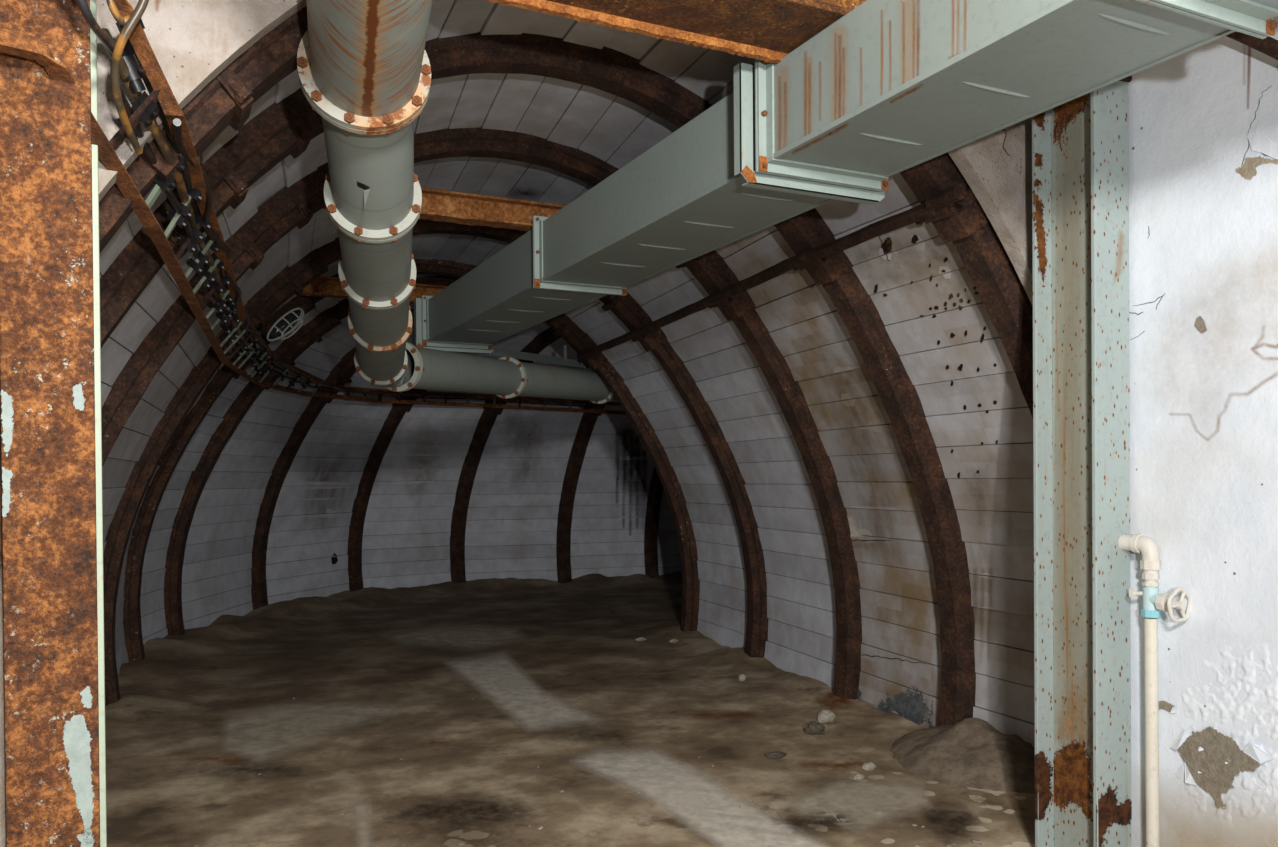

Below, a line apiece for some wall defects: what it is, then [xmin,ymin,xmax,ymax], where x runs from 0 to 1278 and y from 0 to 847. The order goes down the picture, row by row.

rust [487,0,787,64]
rust [1030,93,1090,145]
flaking render [1235,86,1278,180]
rust [1032,153,1048,287]
flaking render [1159,701,1177,713]
rust [1035,739,1132,847]
flaking render [1170,727,1274,810]